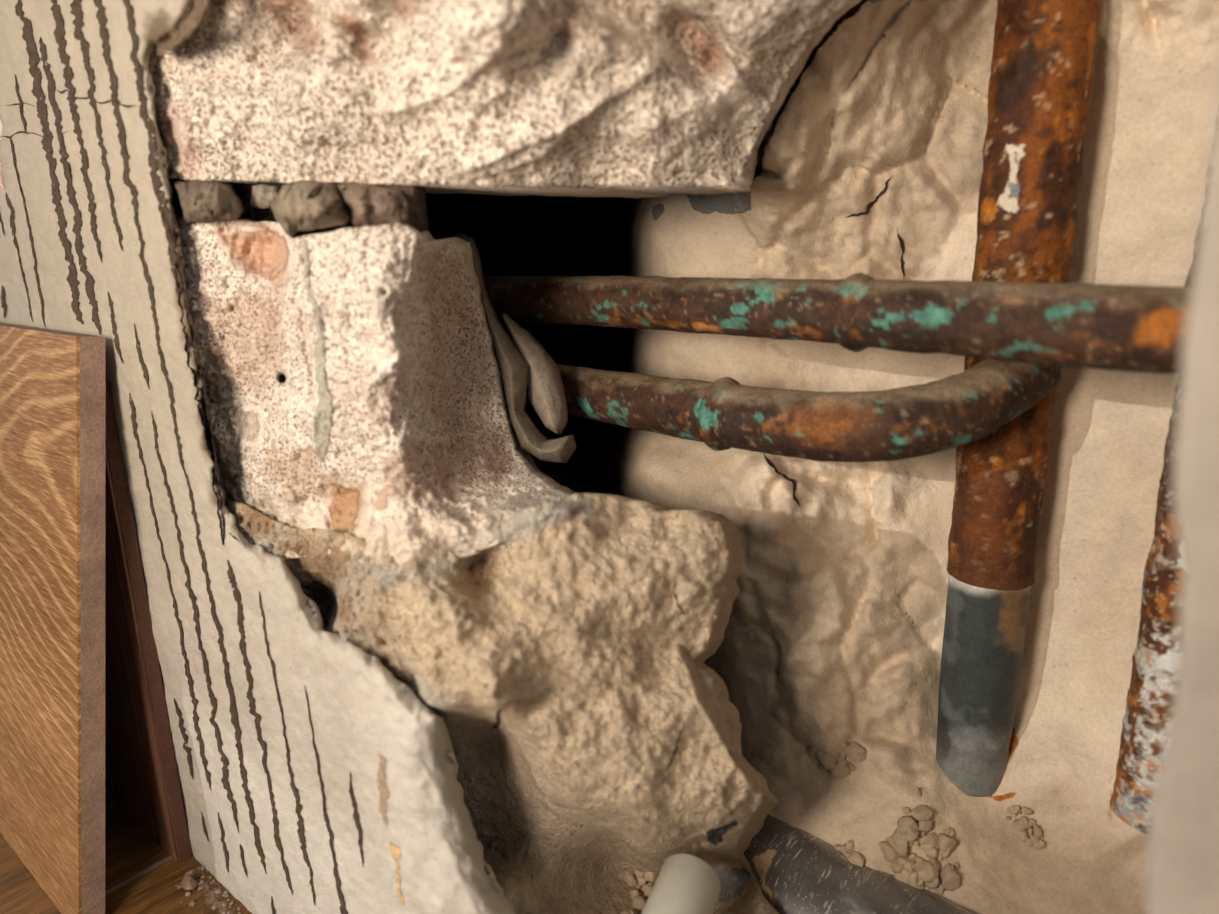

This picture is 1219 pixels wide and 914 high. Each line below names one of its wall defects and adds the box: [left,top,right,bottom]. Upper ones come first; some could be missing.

spalling [149,0,861,198]
crack [752,0,868,182]
spalling [178,216,780,914]